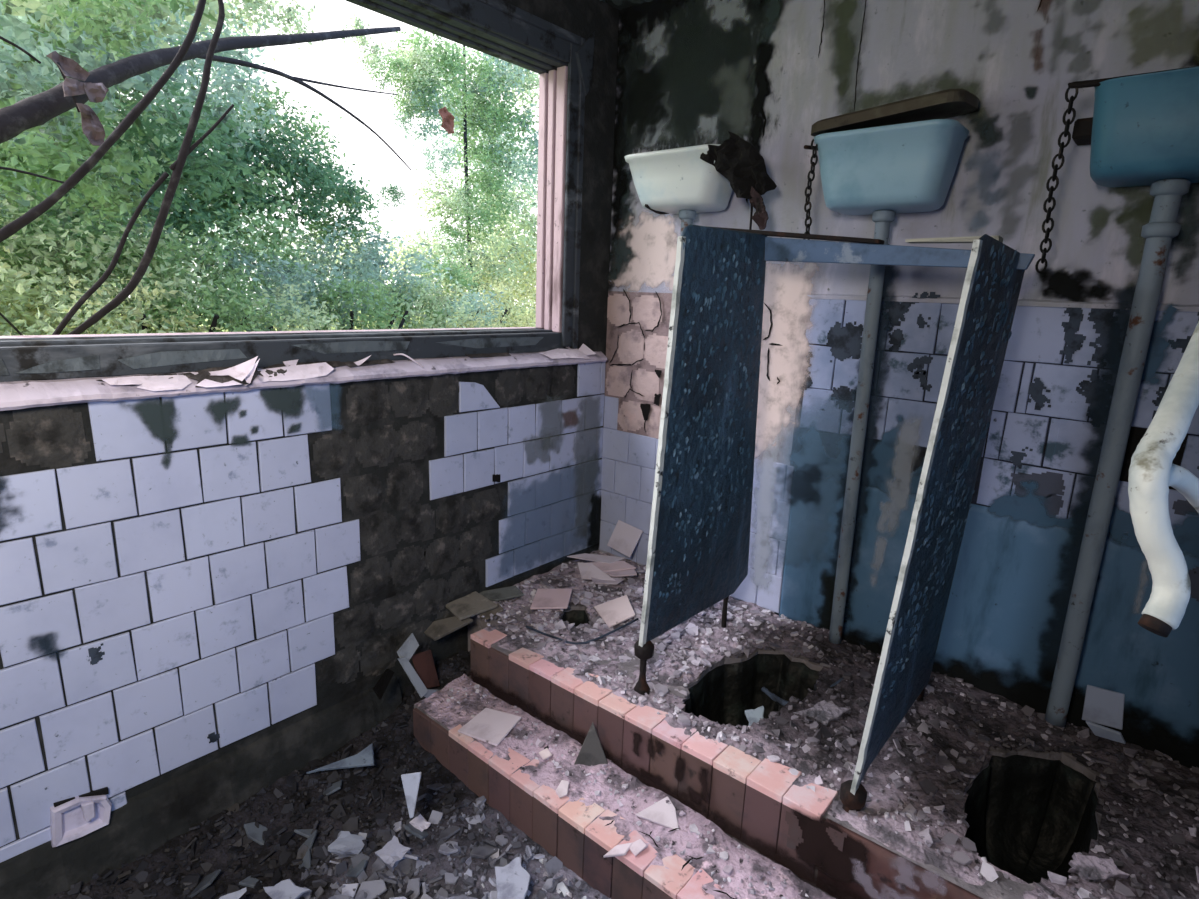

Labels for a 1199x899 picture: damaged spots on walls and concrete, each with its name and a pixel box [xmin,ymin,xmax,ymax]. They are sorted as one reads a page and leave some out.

leakage [835,0,1002,147]
leakage [608,0,784,290]
leakage [1090,186,1154,267]
leakage [1171,183,1199,278]
peeling [826,321,864,363]
leakage [0,478,17,531]
spalling [0,341,500,684]
peeling [435,213,814,667]
leakage [787,466,821,505]
peeling [831,386,855,413]
leakage [818,265,895,630]
spalling [785,810,945,899]